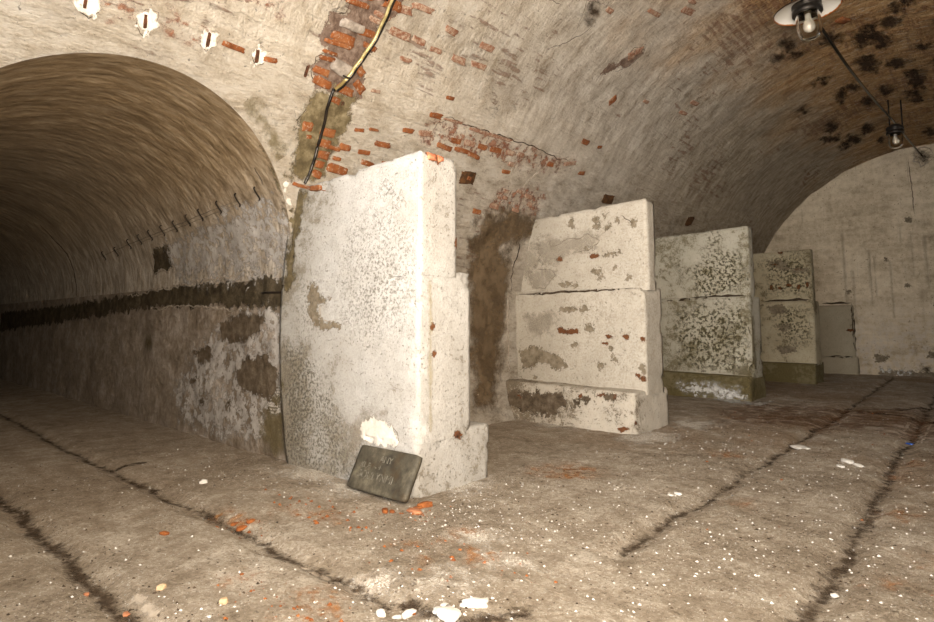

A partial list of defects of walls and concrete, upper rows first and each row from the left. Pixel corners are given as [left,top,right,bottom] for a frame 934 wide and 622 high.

flaking render [310,0,487,99]
flaking render [479,41,495,53]
flaking render [354,128,391,167]
spalling [425,152,444,165]
spalling [459,171,476,185]
crack [907,162,915,215]
flaking render [0,145,326,441]
peeling [307,281,341,333]
leakage [468,204,536,408]
flaking render [559,305,595,332]
spalling [508,345,618,419]
leakage [677,320,772,407]